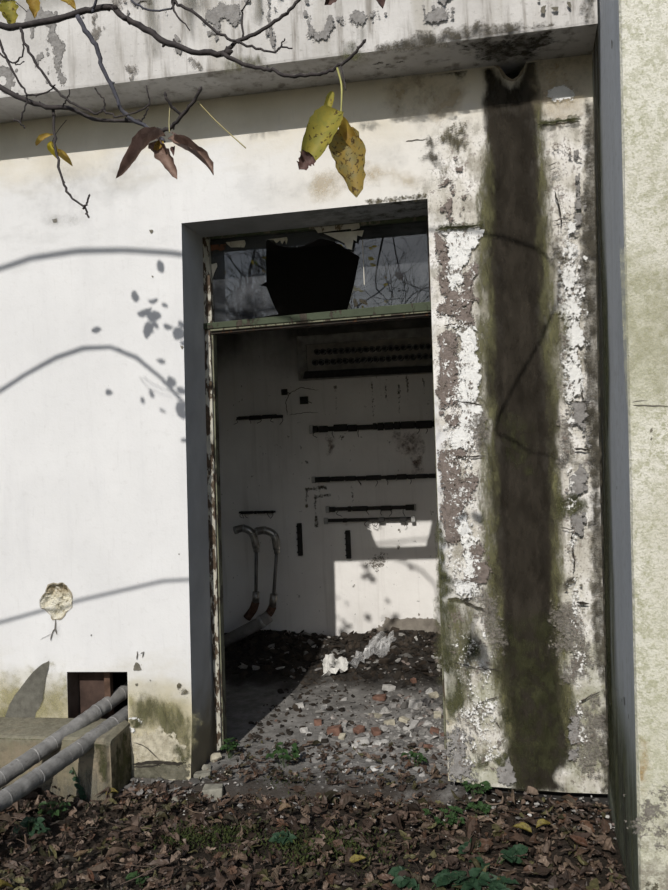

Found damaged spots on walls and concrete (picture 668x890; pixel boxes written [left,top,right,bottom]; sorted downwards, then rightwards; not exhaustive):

peeling [24,6,67,87]
peeling [81,13,104,41]
peeling [202,0,250,41]
peeling [261,0,277,51]
peeling [303,0,387,41]
peeling [422,0,455,24]
peeling [0,65,18,94]
peeling [434,232,479,428]
damp [376,0,627,854]
peeling [431,448,479,547]
peeling [469,541,492,587]
peeling [439,708,478,791]